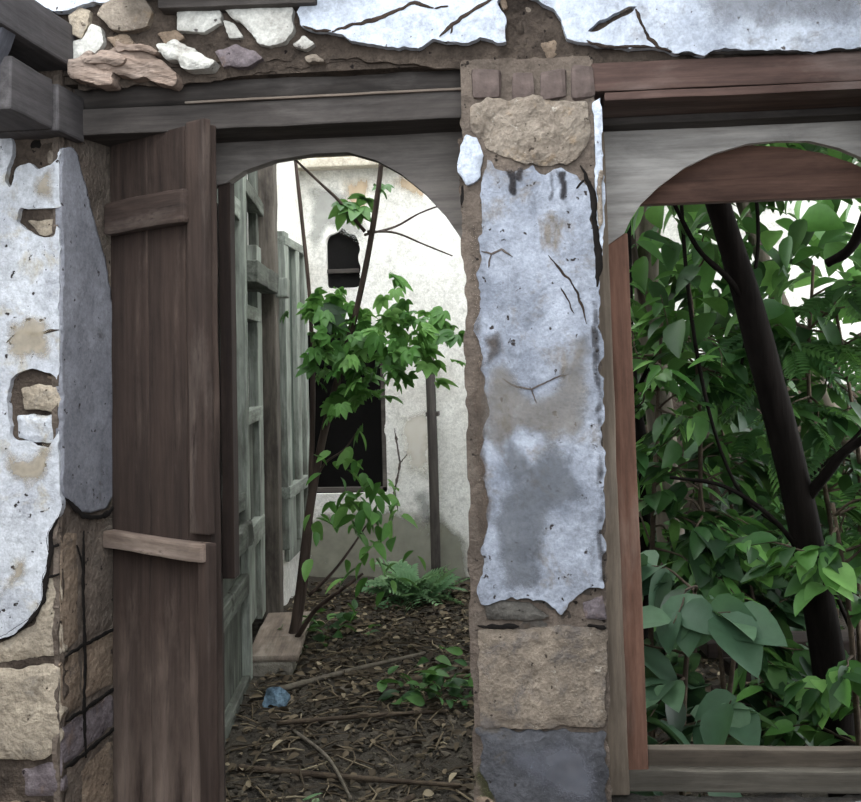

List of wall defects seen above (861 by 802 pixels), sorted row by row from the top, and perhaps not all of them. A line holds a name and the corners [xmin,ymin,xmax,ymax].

crack [302,0,492,37]
flaking render [500,0,531,54]
flaking render [67,0,360,92]
flaking render [541,38,575,58]
flaking render [29,219,53,236]
crack [481,248,513,268]
crack [511,374,568,404]
flaking render [8,375,61,479]